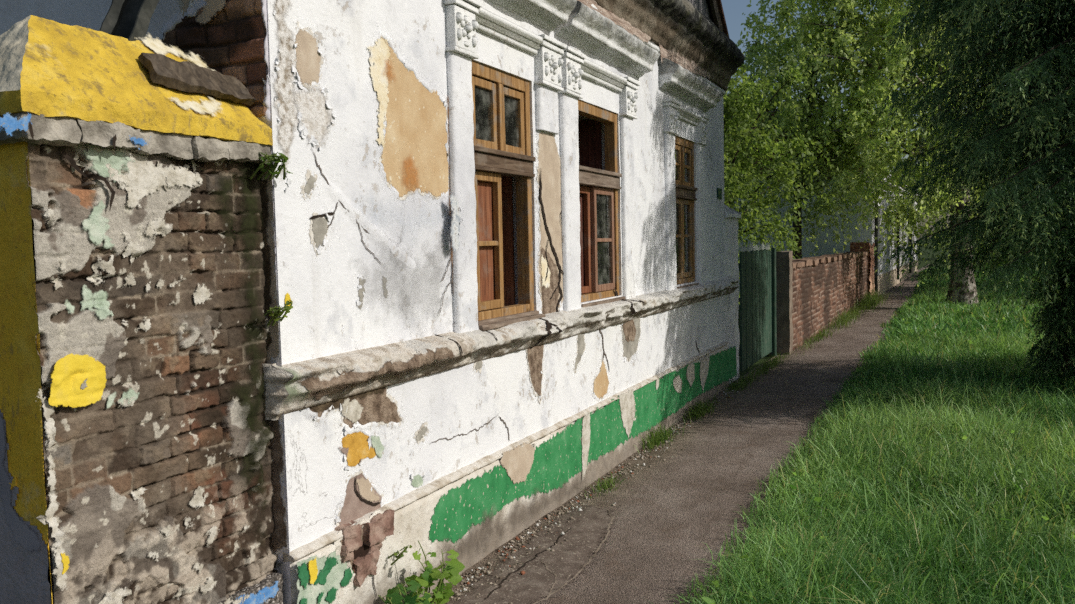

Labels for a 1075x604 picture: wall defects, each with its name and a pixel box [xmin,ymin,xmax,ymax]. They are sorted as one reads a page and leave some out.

peeling [65,200,186,332]
peeling [71,136,203,208]
flaking render [136,0,337,364]
flaking render [367,28,463,252]
crack [529,174,564,348]
flaking render [536,130,564,314]
peeling [0,353,139,604]
flaking render [269,415,288,554]
flaking render [297,347,455,604]
crack [430,413,510,444]
flaking render [525,344,545,404]
crack [485,504,614,604]